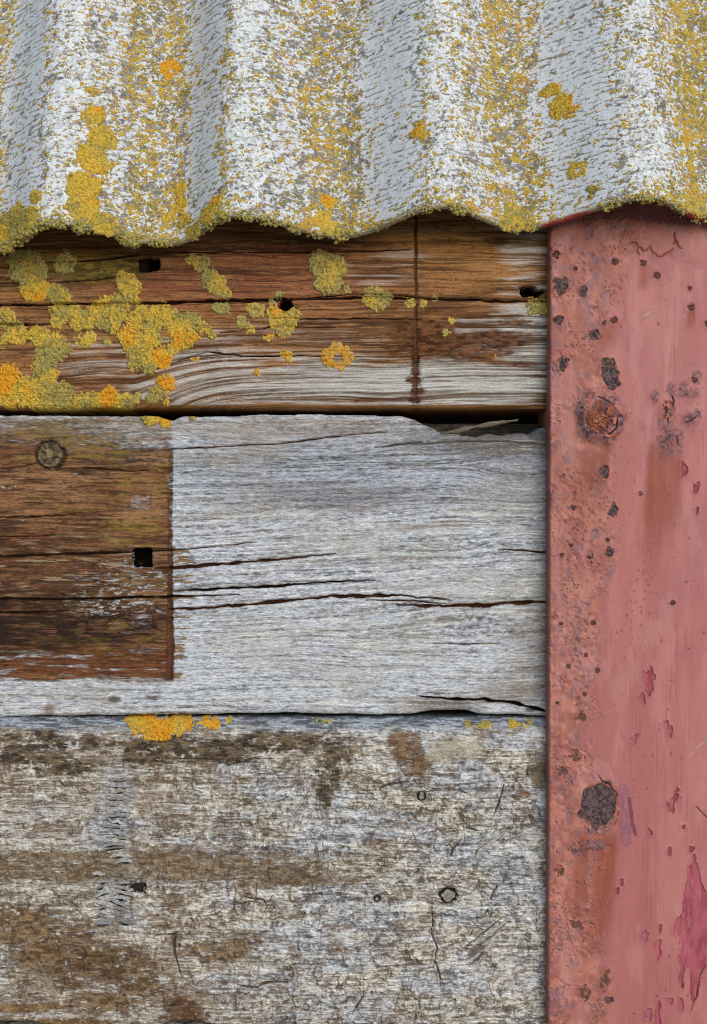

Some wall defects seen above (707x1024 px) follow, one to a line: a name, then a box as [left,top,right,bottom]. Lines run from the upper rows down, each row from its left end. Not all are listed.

corrosion [552,277,588,297]
corrosion [601,357,621,390]
corrosion [598,445,610,480]
crack [0,514,130,557]
crack [0,542,546,613]
peeling [640,666,656,704]
crack [421,696,545,712]
corrosion [555,749,586,777]
corrosion [571,781,620,855]
peeling [641,846,707,1024]
corrosion [578,968,614,1004]